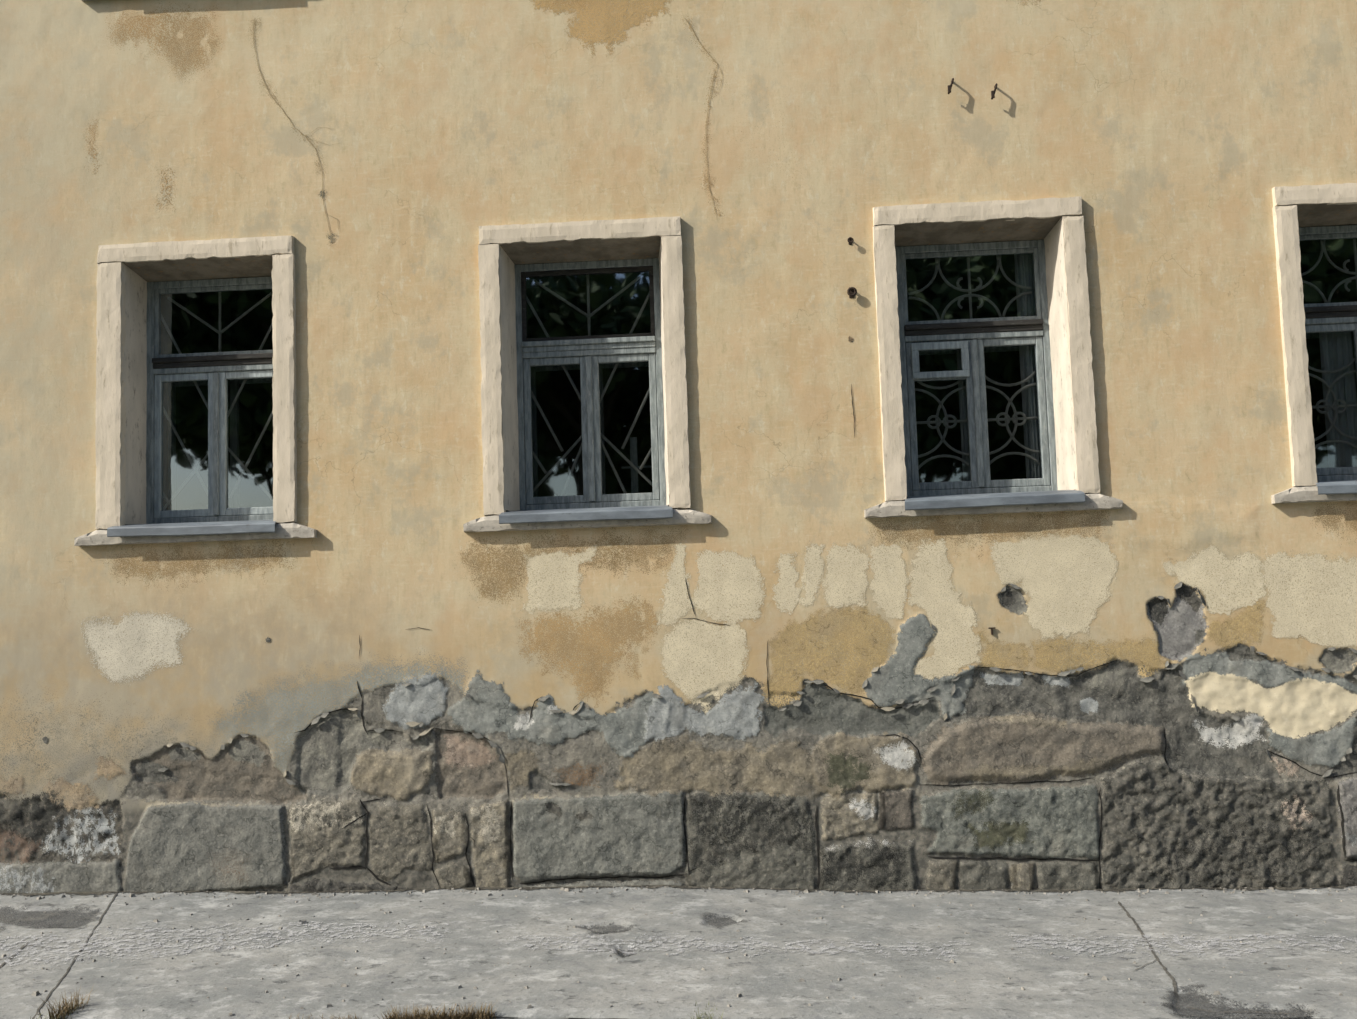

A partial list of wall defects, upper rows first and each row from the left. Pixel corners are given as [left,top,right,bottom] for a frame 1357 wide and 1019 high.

crack [248,18,339,244]
crack [683,16,723,217]
water stain [0,652,468,847]
spalling [0,582,1357,867]
water stain [0,862,58,893]